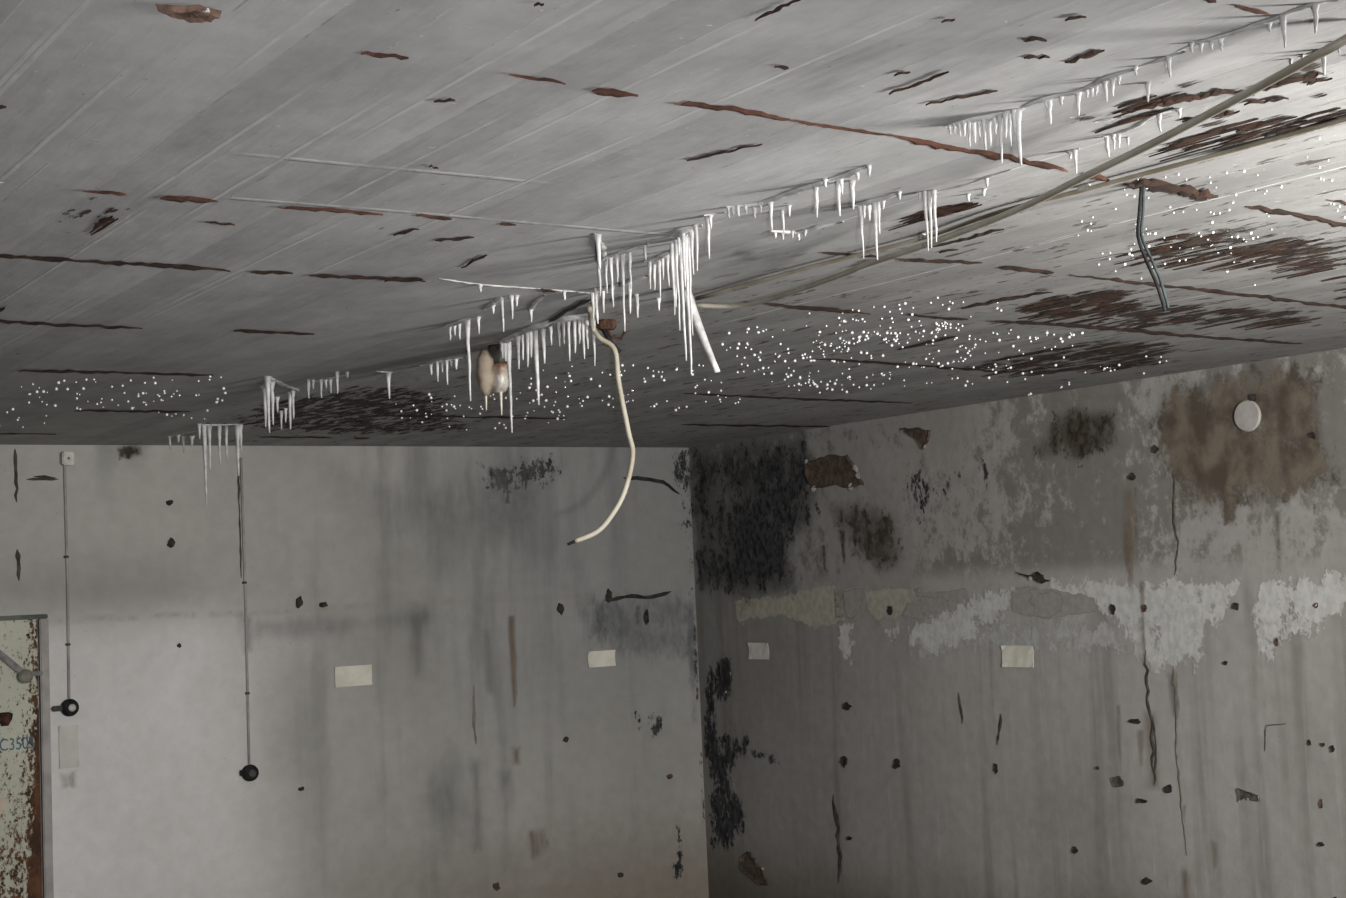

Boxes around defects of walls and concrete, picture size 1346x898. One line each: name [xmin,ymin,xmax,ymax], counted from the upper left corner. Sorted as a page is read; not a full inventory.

damp [419,0,1340,433]
damp [673,435,905,609]
flaking render [804,454,864,492]
damp [1150,363,1337,525]
peeling [882,561,1346,675]
damp [690,624,779,852]